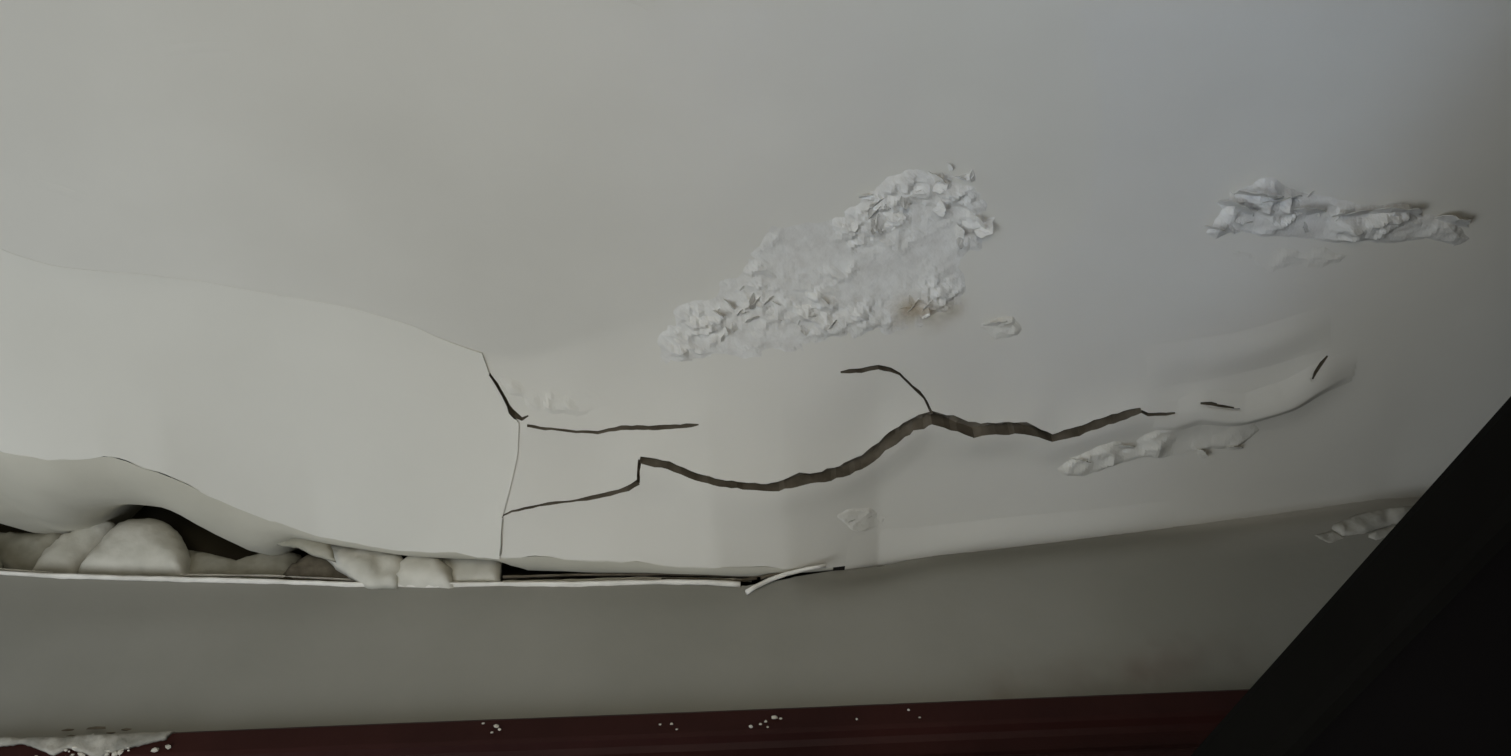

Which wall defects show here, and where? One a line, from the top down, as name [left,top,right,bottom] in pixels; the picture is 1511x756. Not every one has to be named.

spalling [1204,177,1471,246]
spalling [657,163,995,364]
crack [1312,356,1328,379]
crack [489,365,1240,516]
spalling [1057,423,1259,476]
flaking render [277,538,403,589]
flaking render [441,558,502,582]
flaking render [0,726,175,756]